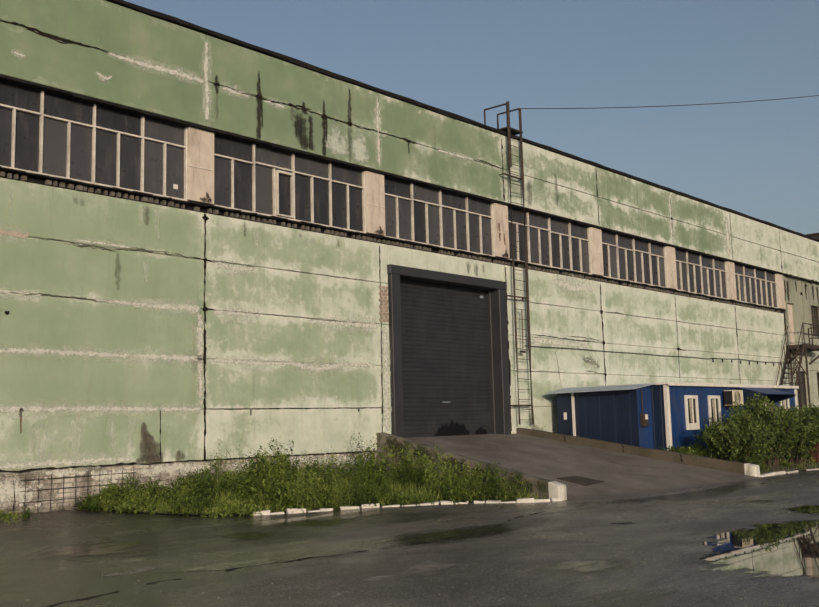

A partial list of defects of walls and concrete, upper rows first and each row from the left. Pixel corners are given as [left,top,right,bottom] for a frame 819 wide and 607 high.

crack [0,20,110,54]
damp [292,101,368,162]
damp [137,423,163,463]
peeling [0,452,217,507]